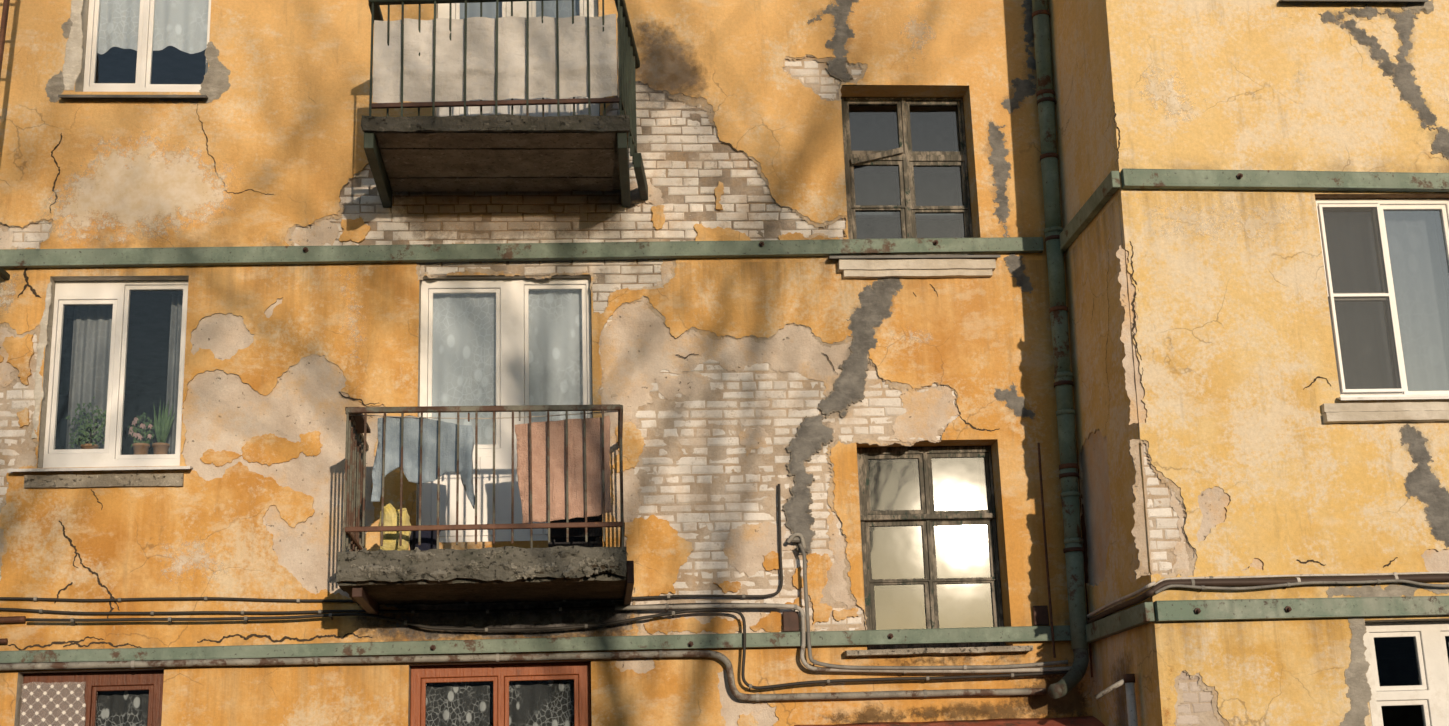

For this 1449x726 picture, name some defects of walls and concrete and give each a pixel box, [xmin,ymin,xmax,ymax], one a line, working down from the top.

flaking render [285,81,847,246]
water stain [635,25,705,104]
crack [807,0,859,86]
crack [988,0,1036,293]
crack [1319,4,1449,160]
flaking render [0,323,46,580]
crack [8,521,142,650]
flaking render [182,258,960,636]
crack [782,278,938,555]
peeling [1081,430,1112,586]
flaking render [1116,245,1230,580]
crack [1399,423,1449,549]